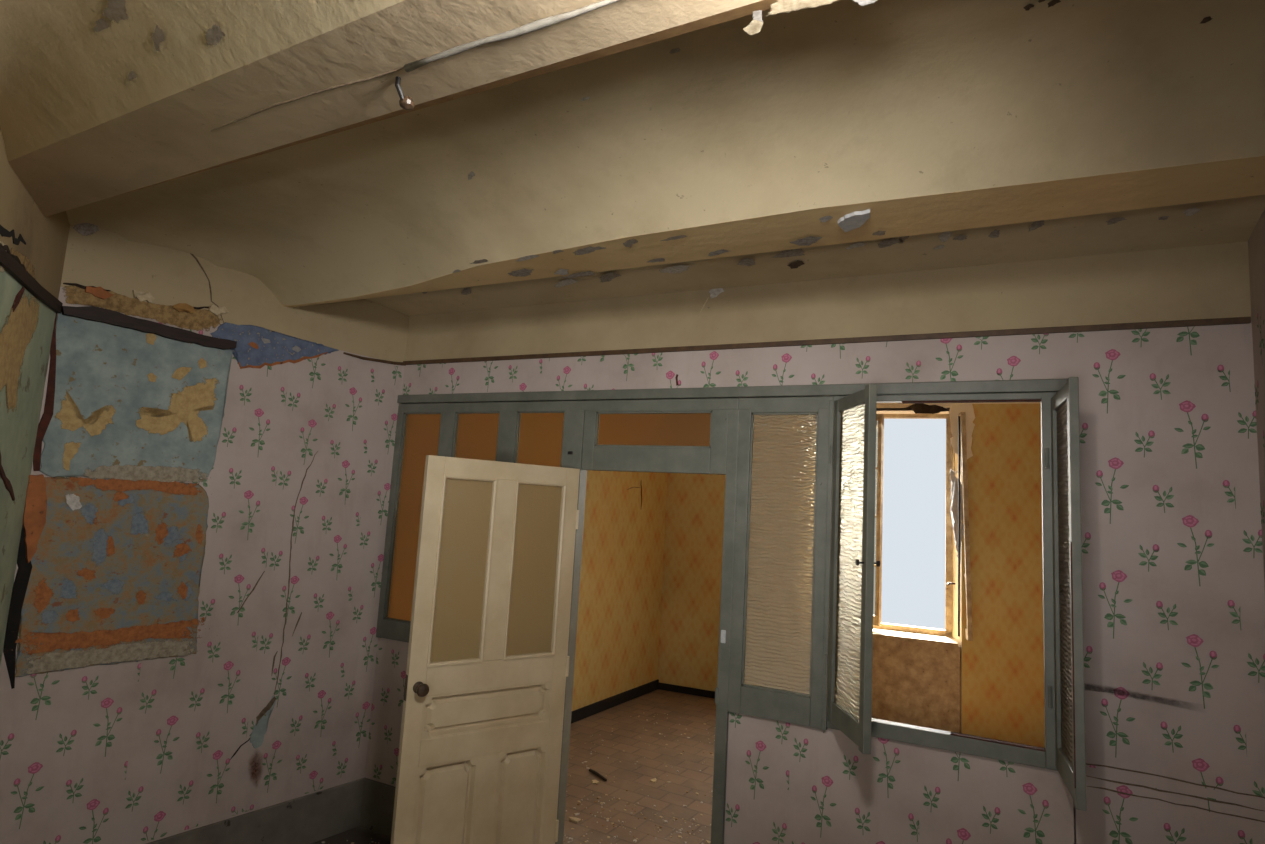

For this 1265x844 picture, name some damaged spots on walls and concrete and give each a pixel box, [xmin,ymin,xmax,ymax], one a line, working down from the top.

peeling [744,0,838,35]
crack [0,225,26,245]
peeling [508,246,605,277]
peeling [771,236,822,269]
peeling [819,209,909,249]
crack [12,287,25,312]
peeling [0,291,39,411]
peeling [13,283,339,677]
crack [0,313,58,689]
crack [237,451,318,695]